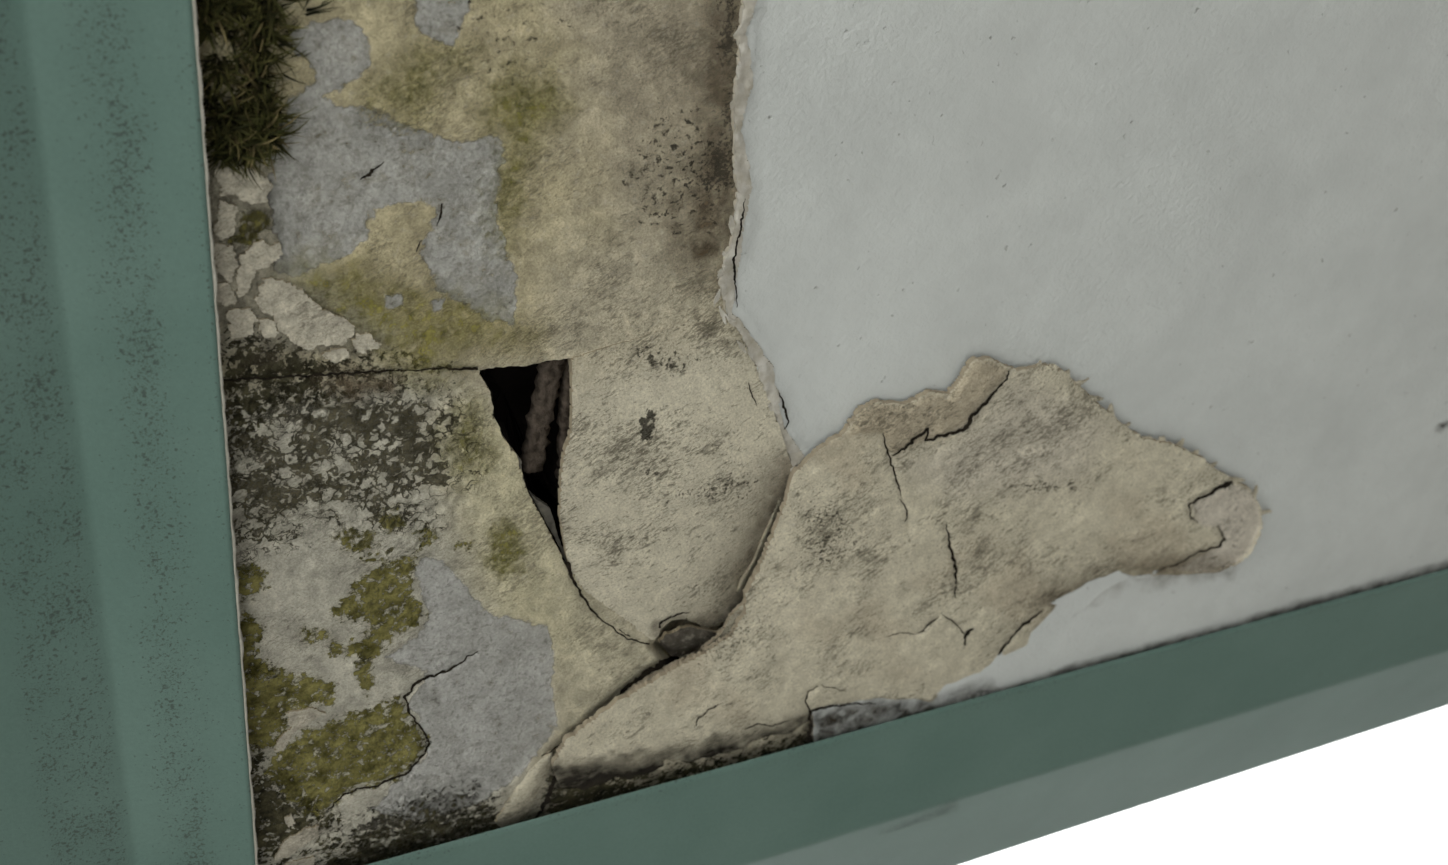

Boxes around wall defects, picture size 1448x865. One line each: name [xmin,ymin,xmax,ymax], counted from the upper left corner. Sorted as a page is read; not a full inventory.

peeling [415,0,469,46]
peeling [212,18,518,364]
crack [732,202,745,307]
crack [882,370,1009,521]
crack [566,562,687,706]
peeling [374,355,1272,828]
crack [887,524,1054,655]
peeling [274,813,319,865]
peeling [274,707,327,752]
damp [250,743,503,865]
crack [328,651,478,810]
damp [527,690,983,818]